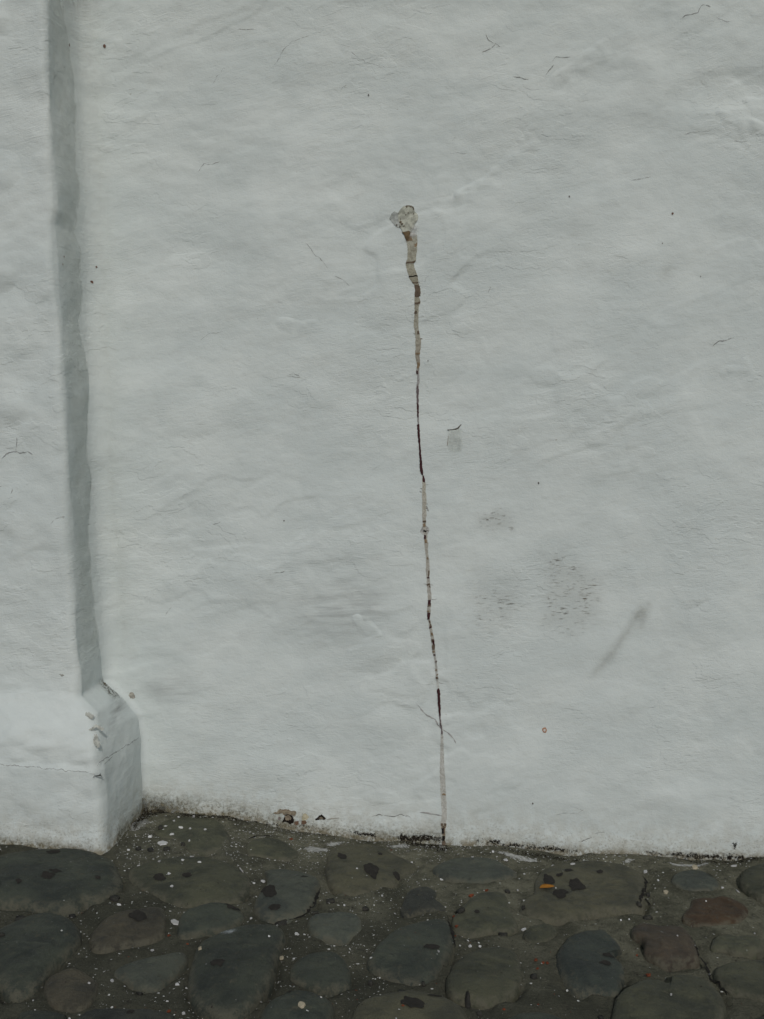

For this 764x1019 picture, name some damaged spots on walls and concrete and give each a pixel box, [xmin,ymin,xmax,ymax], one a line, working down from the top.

crack [372,231,456,845]